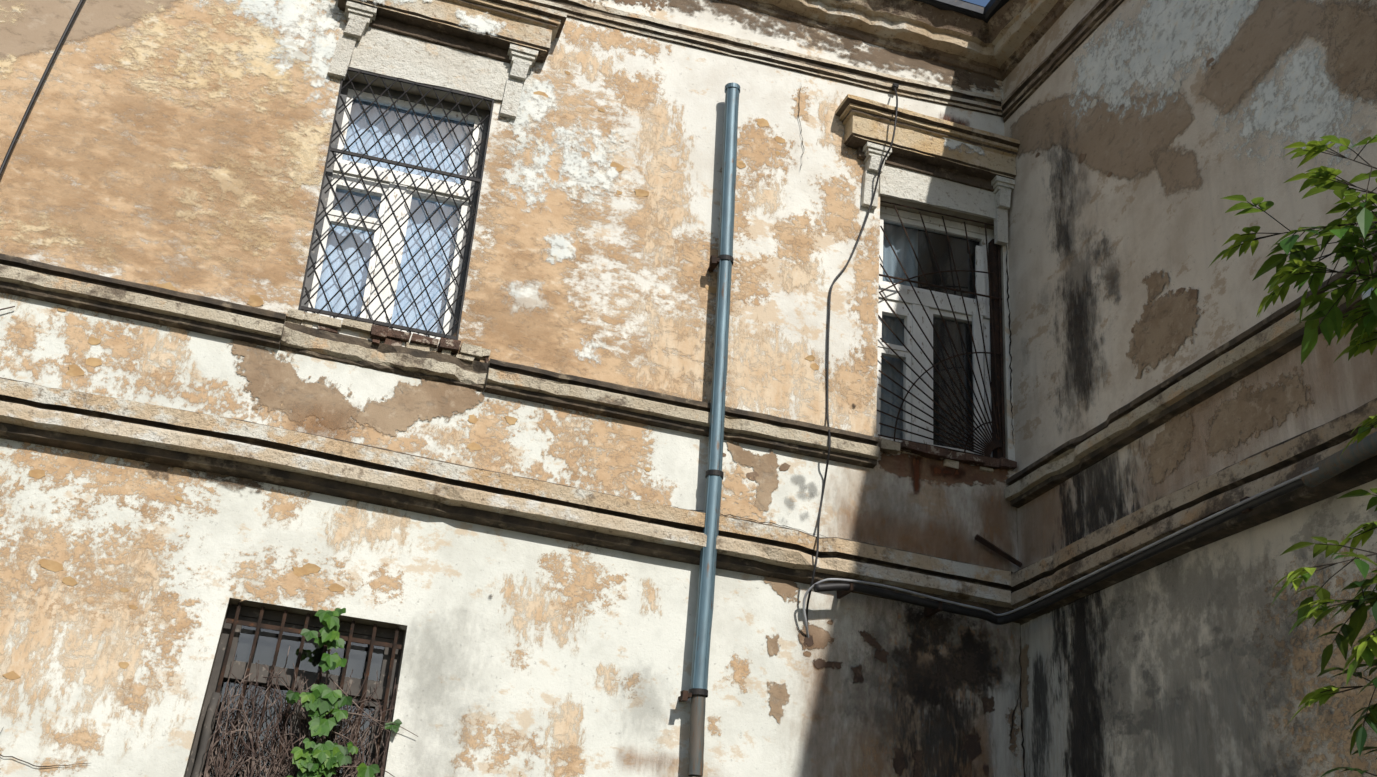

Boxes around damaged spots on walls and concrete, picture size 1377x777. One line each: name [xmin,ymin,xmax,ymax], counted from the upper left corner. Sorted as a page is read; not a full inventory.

peeling [456,9,506,36]
peeling [1064,0,1377,167]
peeling [0,0,348,322]
peeling [458,19,1009,487]
damp [1056,274,1102,404]
spalling [1126,270,1204,379]
peeling [0,442,219,777]
peeling [451,701,586,777]
peeling [501,544,662,670]
peeling [766,634,781,656]
peeling [767,682,790,724]
damp [853,596,1100,777]